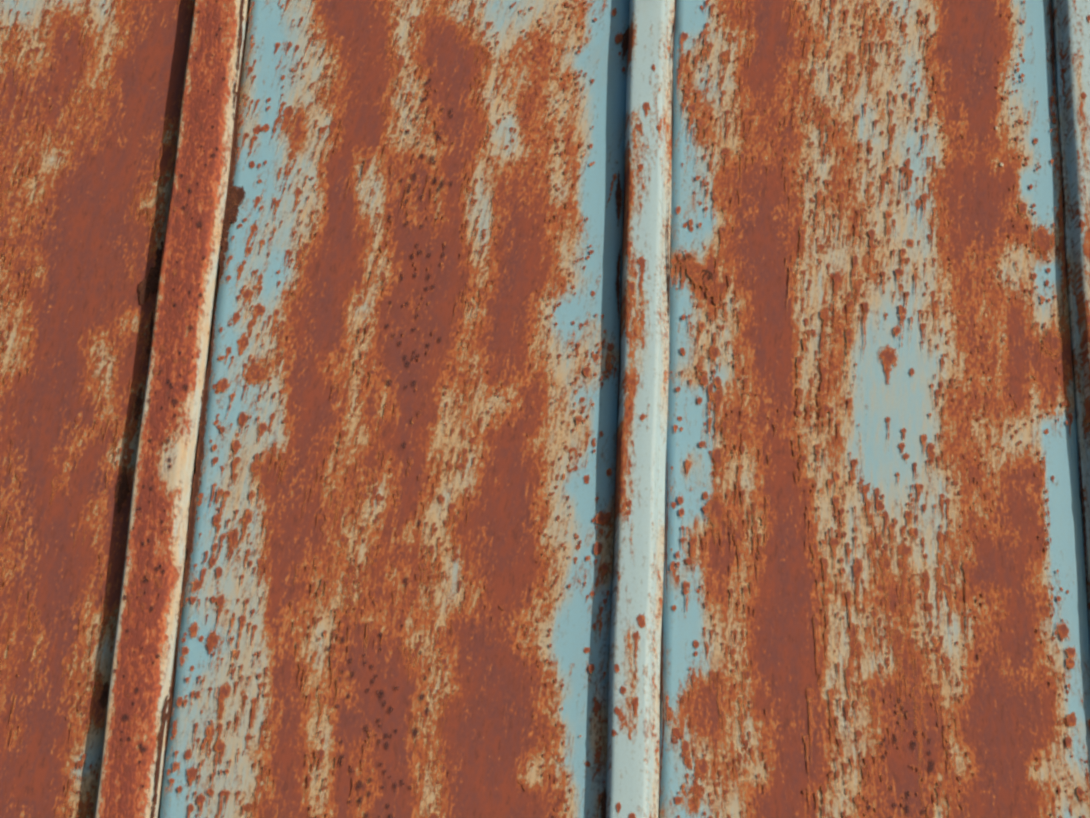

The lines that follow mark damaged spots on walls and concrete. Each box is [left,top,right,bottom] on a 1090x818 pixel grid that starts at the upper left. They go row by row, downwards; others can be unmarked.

rust [0,0,676,818]
peeling [439,0,565,273]
rust [585,0,1090,818]